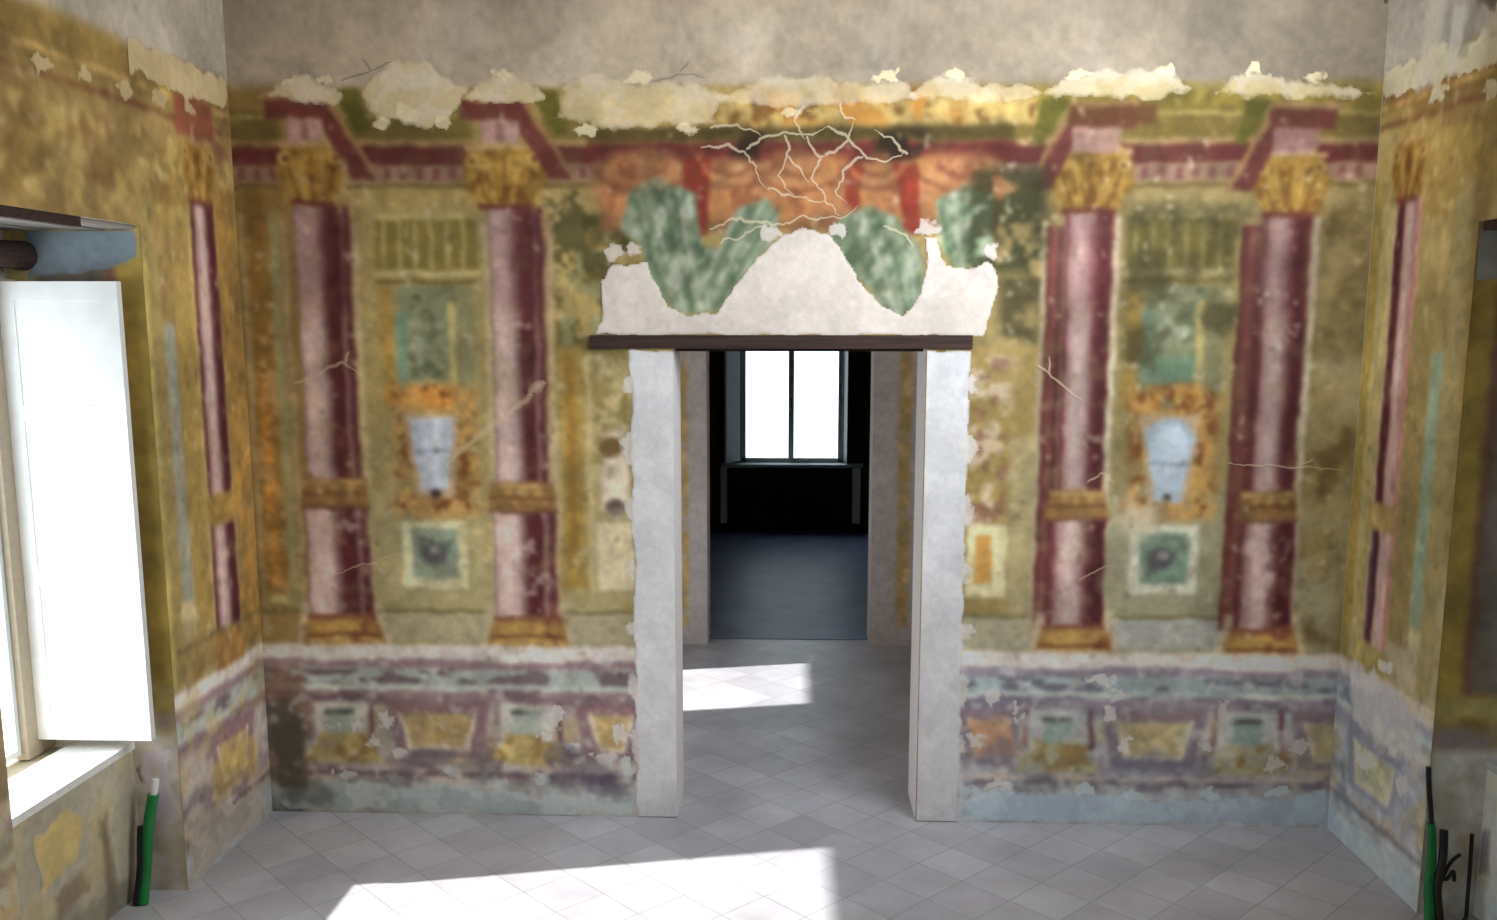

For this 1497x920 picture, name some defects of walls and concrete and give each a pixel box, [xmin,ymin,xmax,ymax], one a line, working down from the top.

peeling [29,49,54,79]
peeling [75,63,92,84]
peeling [115,35,228,117]
peeling [266,72,343,107]
peeling [361,58,1193,138]
peeling [1214,37,1497,106]
crack [700,102,917,251]
spalling [280,218,1414,906]
peeling [1349,657,1426,799]